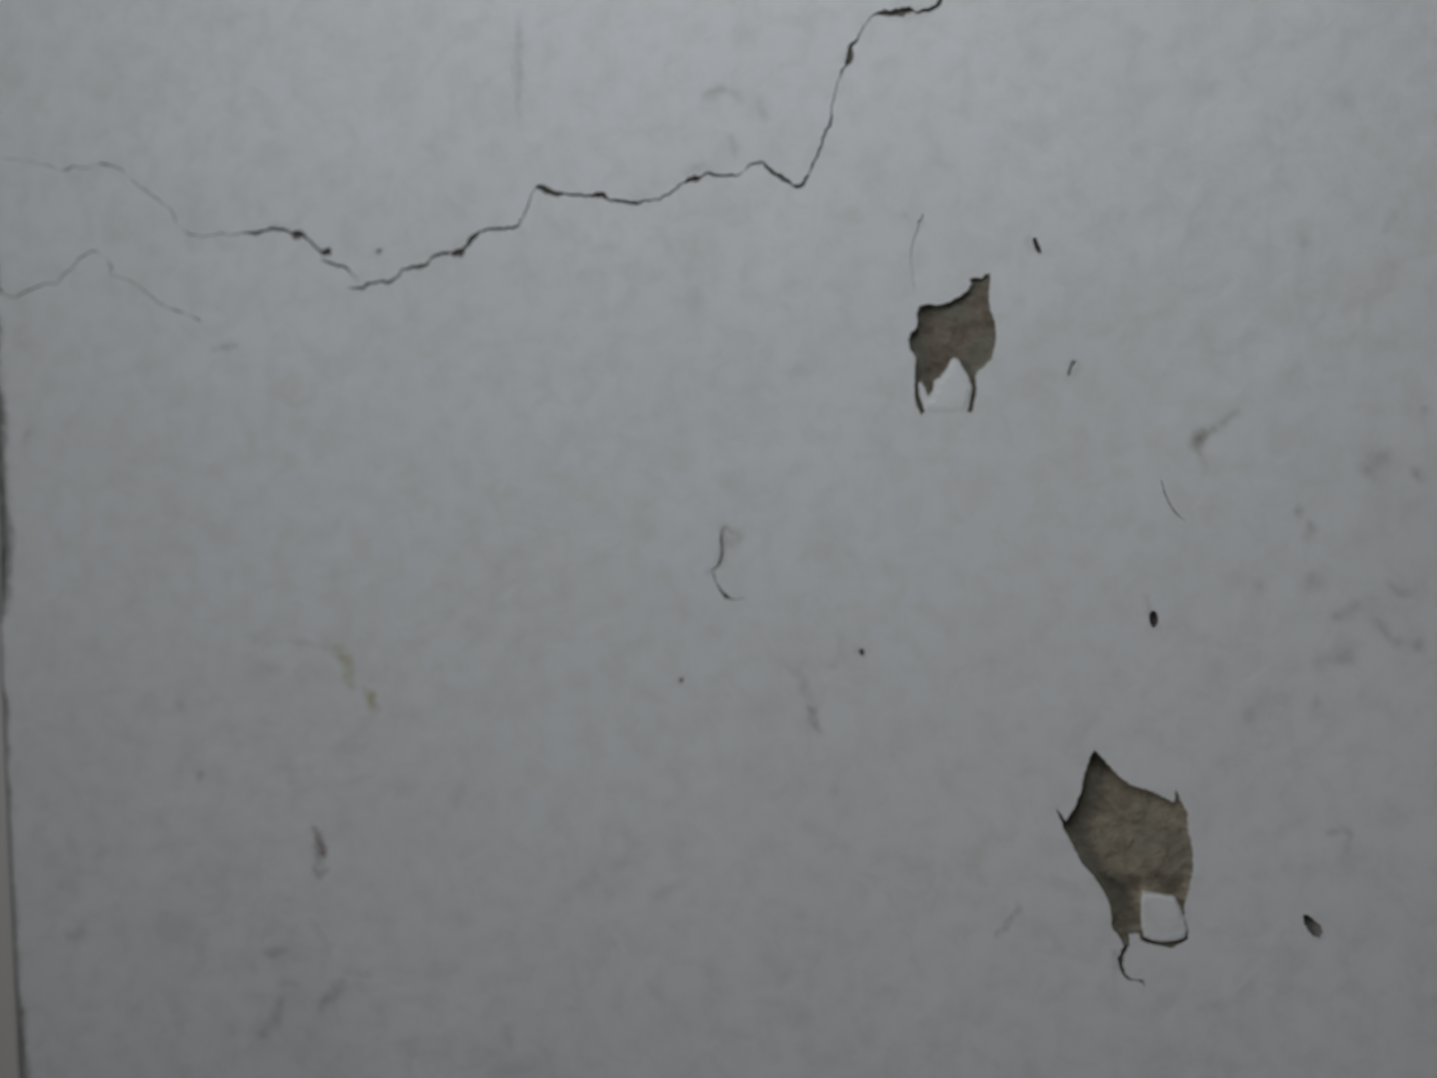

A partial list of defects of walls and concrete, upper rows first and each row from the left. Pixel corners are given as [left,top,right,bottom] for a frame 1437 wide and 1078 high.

crack [0,0,942,290]
spalling [908,273,996,415]
crack [0,393,8,626]
crack [712,525,745,600]
crack [8,779,25,1078]
spalling [1056,750,1193,986]